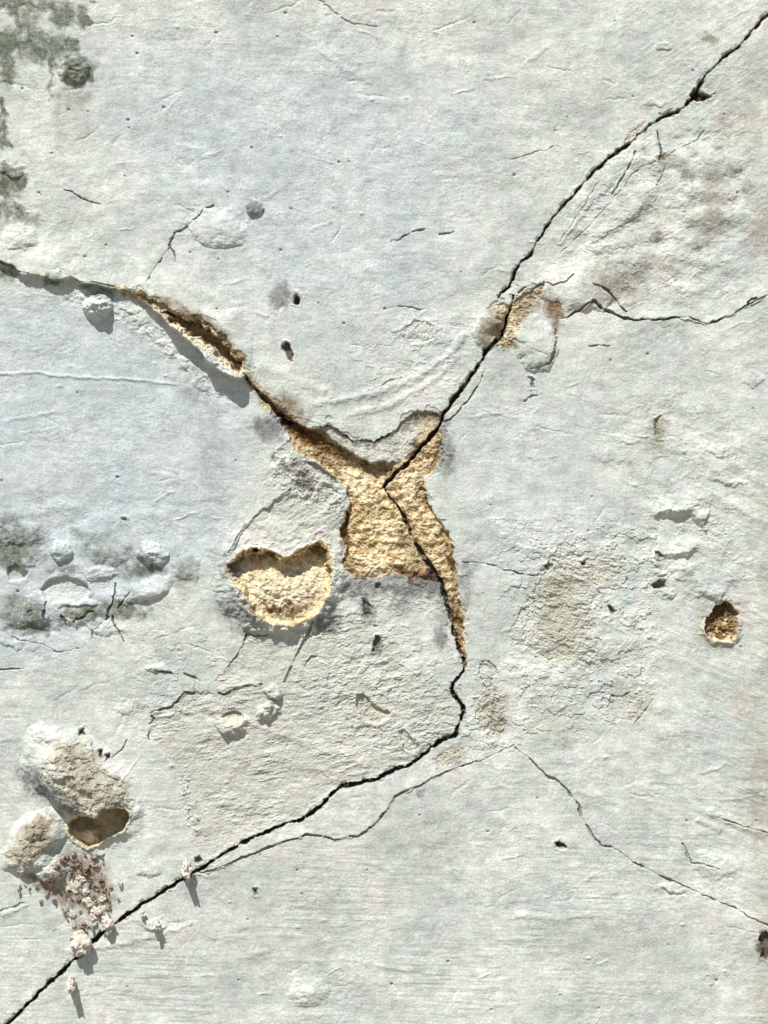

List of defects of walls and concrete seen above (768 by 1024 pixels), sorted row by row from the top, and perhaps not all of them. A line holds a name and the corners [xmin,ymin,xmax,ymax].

water stain [0,0,95,91]
water stain [0,97,13,147]
water stain [0,163,26,217]
crack [59,204,216,307]
spalling [133,285,253,377]
spalling [487,278,549,353]
crack [90,10,768,931]
crack [11,582,132,654]
peeling [146,405,512,865]
spalling [701,597,741,644]
spalling [59,801,133,851]
crack [4,928,107,1024]